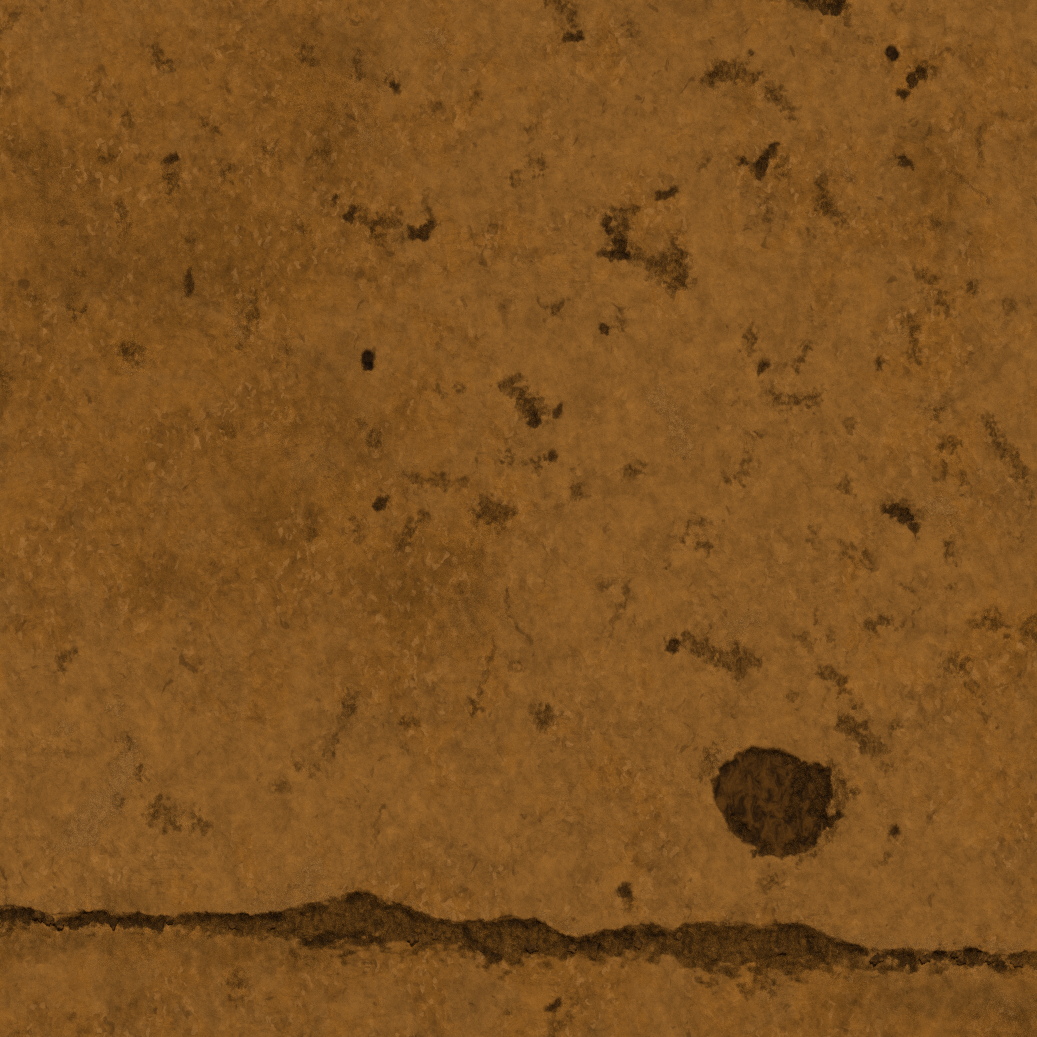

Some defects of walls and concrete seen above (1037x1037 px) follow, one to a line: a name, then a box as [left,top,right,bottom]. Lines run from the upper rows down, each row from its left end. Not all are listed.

peeling [817,811,842,827]
peeling [752,841,774,858]
crack [0,889,1037,986]